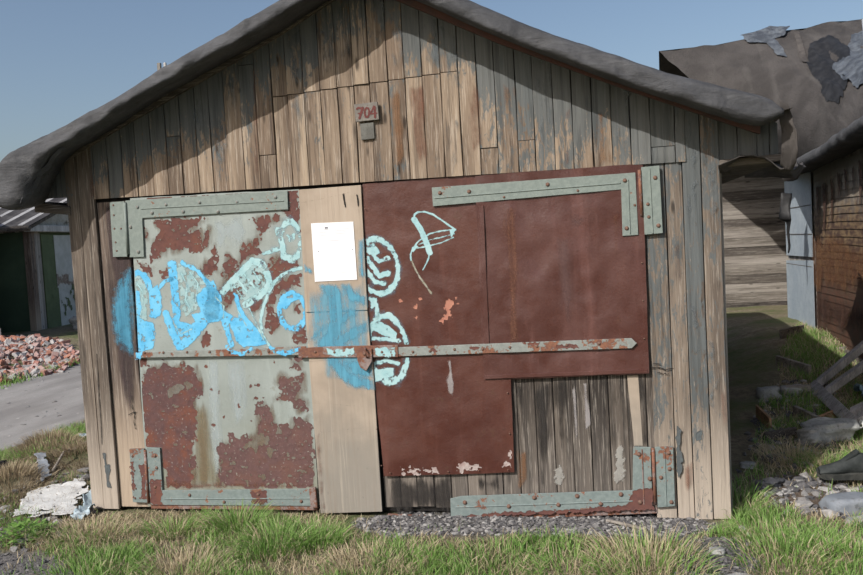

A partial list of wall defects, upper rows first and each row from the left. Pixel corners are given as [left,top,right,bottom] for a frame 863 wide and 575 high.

corrosion [137,191,302,335]
corrosion [201,331,212,348]
corrosion [292,325,308,345]
corrosion [129,356,316,505]
corrosion [401,465,439,476]
corrosion [457,462,482,474]
corrosion [467,488,655,517]